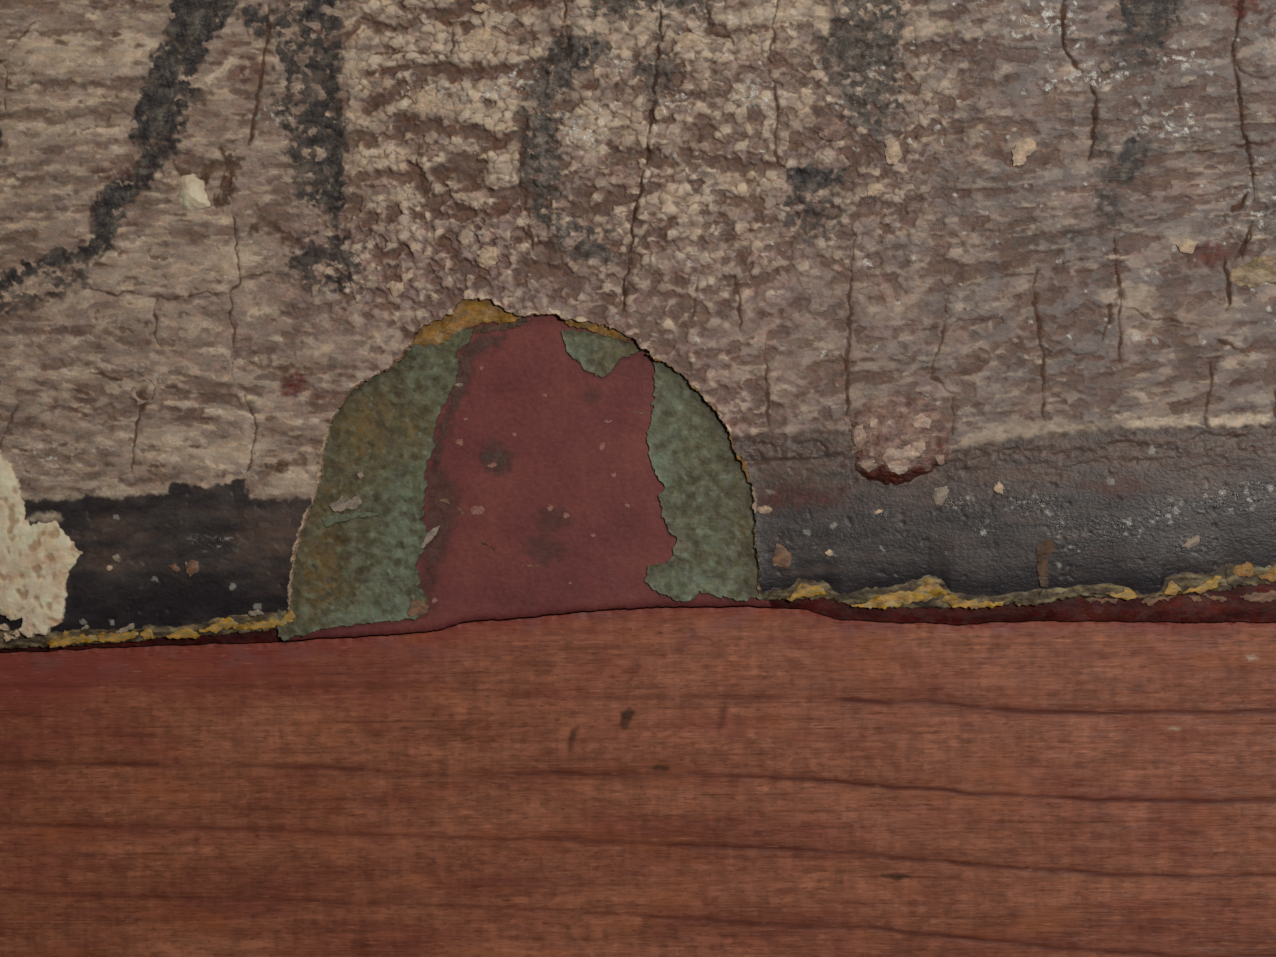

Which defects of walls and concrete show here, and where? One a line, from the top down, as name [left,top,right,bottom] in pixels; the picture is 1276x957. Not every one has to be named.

crack [622,11,663,311]
crack [968,0,1273,423]
peeling [0,299,1276,649]